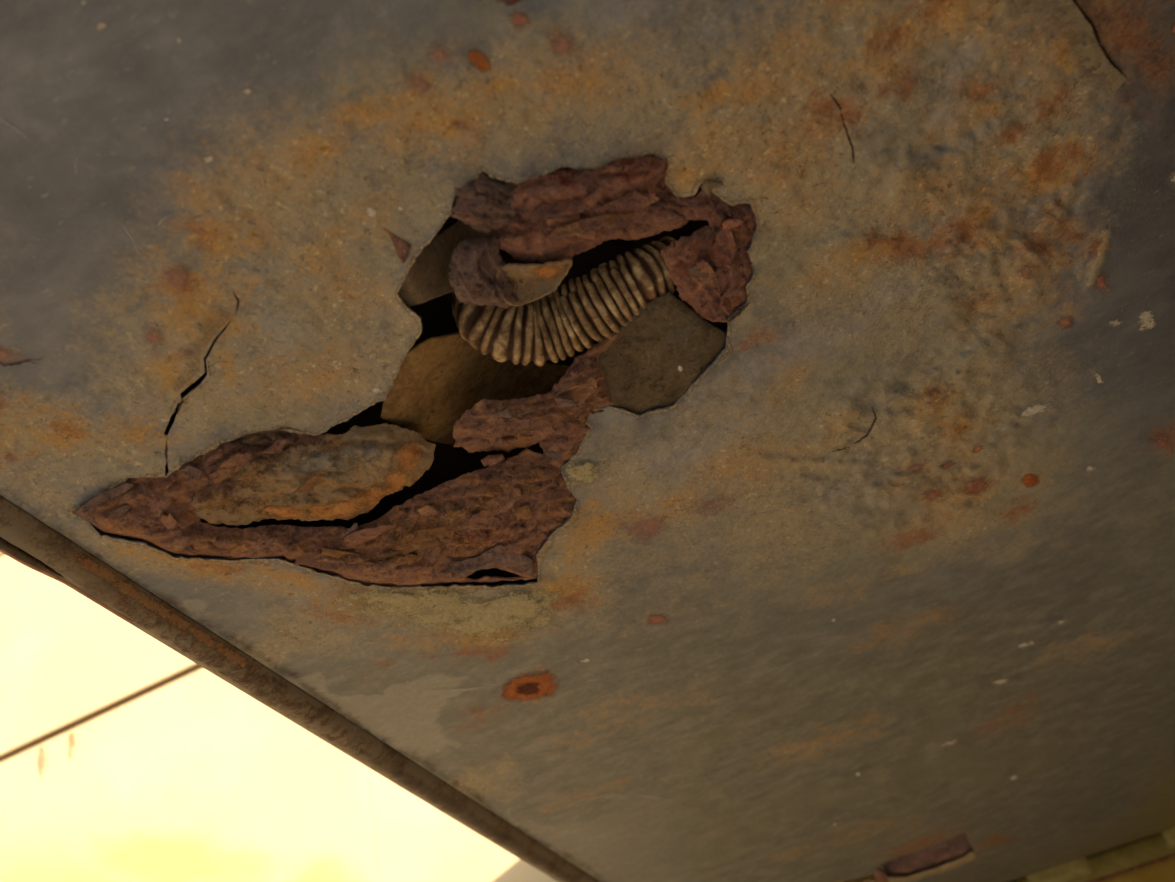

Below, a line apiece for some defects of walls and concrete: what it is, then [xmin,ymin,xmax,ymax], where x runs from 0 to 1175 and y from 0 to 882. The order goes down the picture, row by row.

peeling [366,207,411,263]
corrosion [0,0,1175,449]
peeling [696,228,738,294]
crack [172,292,240,415]
corrosion [0,279,678,820]
corrosion [936,412,1115,550]